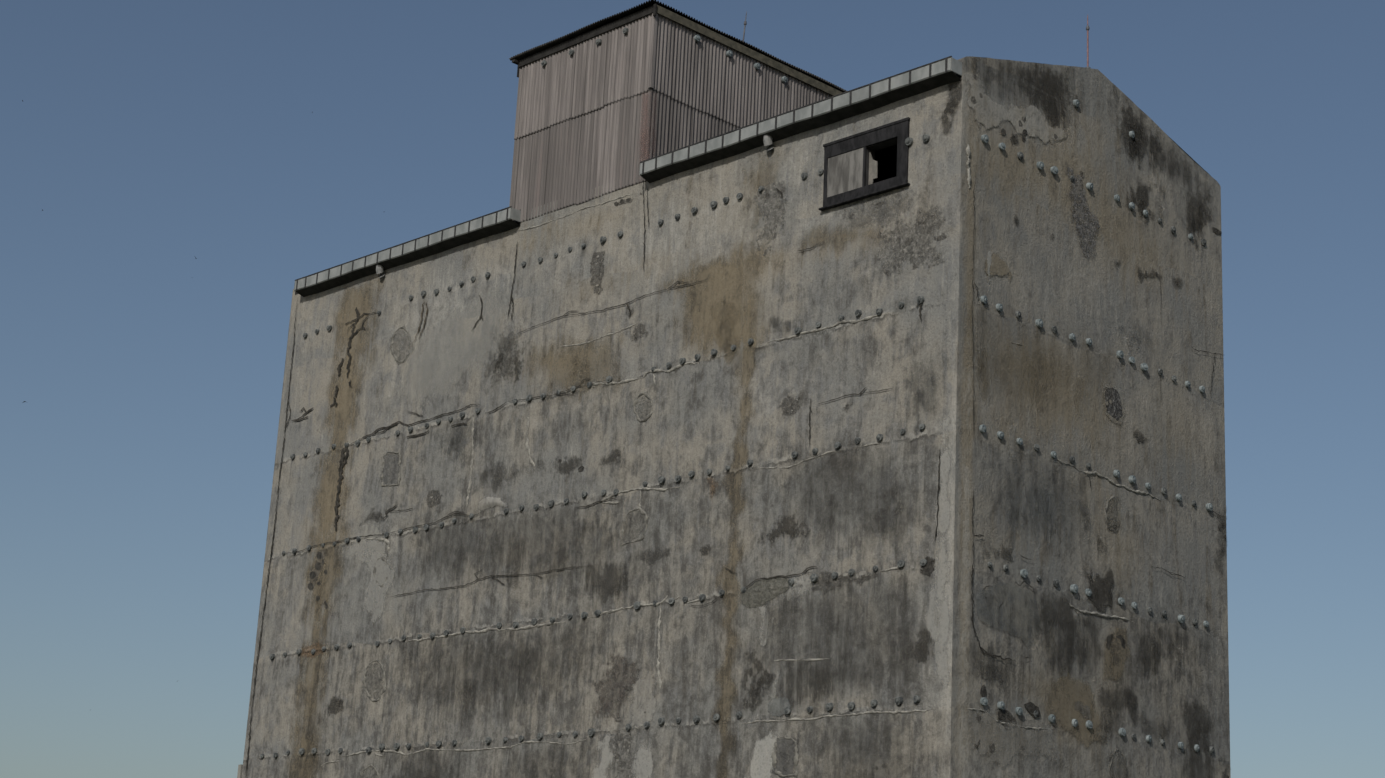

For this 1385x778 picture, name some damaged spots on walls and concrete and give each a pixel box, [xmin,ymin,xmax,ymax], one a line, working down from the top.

leakage [942,56,1084,134]
leakage [1110,89,1212,233]
crack [472,182,704,334]
spalling [1066,167,1099,257]
spalling [1105,387,1123,420]
crack [1192,347,1222,395]
crack [245,303,602,777]
crack [692,566,816,606]
crack [933,450,941,544]
crack [971,489,1038,661]
leakage [1033,569,1162,776]